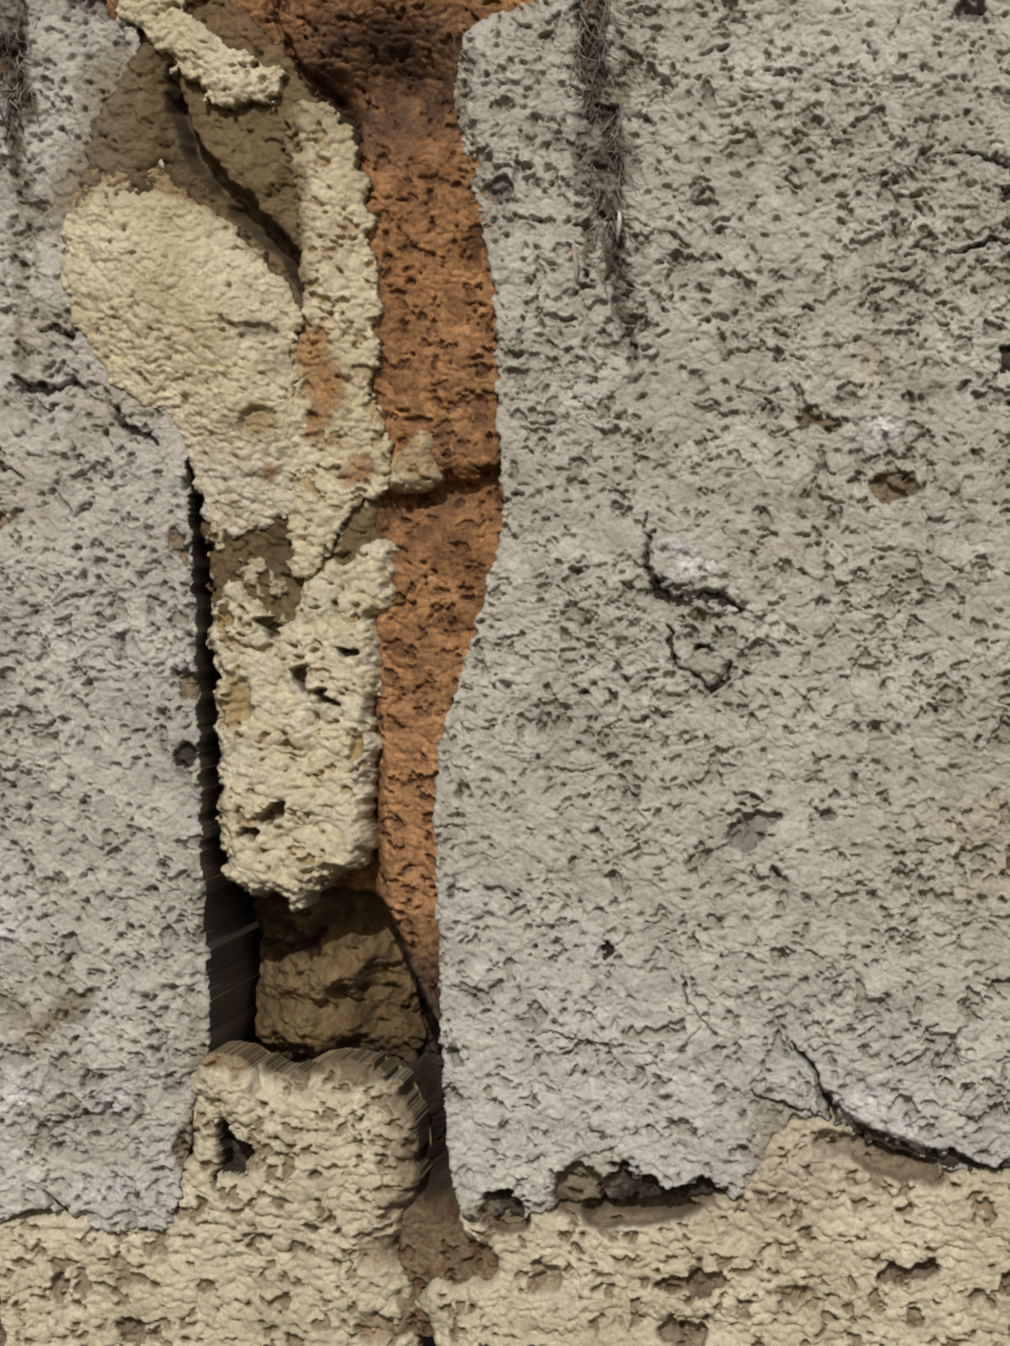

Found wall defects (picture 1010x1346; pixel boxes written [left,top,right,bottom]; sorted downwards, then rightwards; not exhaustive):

spalling [67,0,110,22]
crack [643,514,745,693]
spalling [173,741,199,768]
spalling [447,1039,468,1068]
crack [764,1048,1006,1172]
spalling [205,1120,255,1191]
spalling [554,1148,728,1201]
spalling [481,1189,525,1216]
spalling [653,1268,729,1300]
spalling [876,1250,946,1285]
spalling [1000,1271,1010,1296]
spalling [658,1314,715,1346]